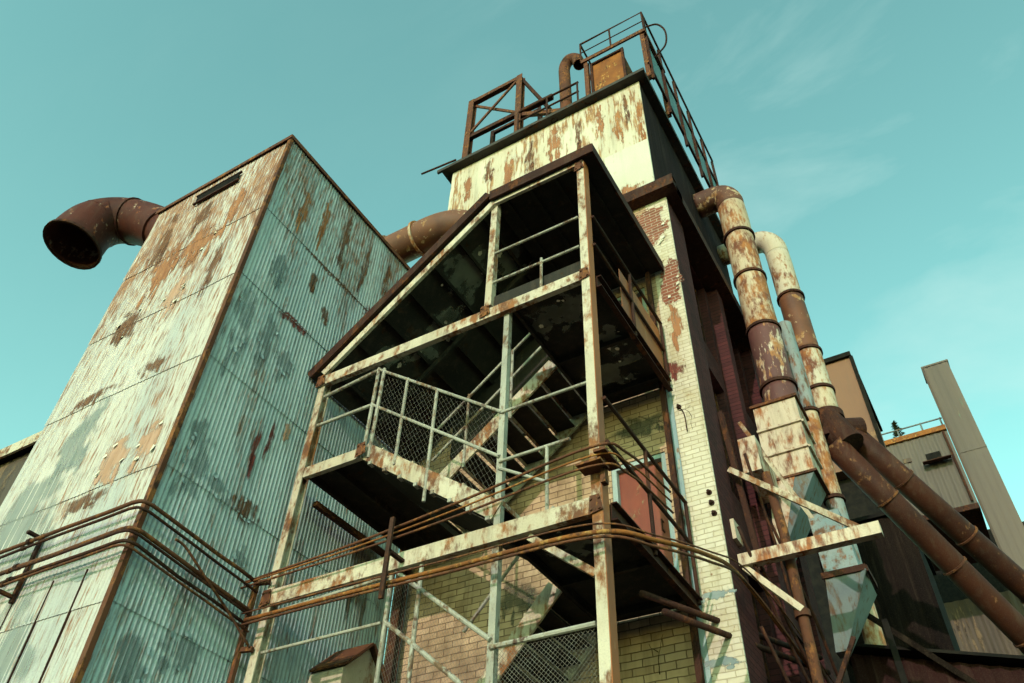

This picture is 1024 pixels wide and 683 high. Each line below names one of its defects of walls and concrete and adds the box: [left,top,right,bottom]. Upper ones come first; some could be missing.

rust [136,202,212,309]
rust [198,187,246,296]
rust [295,190,313,234]
rust [306,200,371,314]
peeling [636,204,670,246]
peeling [658,258,684,306]
rust [279,311,311,336]
rust [137,357,165,379]
peeling [93,419,165,485]
rust [247,423,291,478]
rust [63,489,105,519]